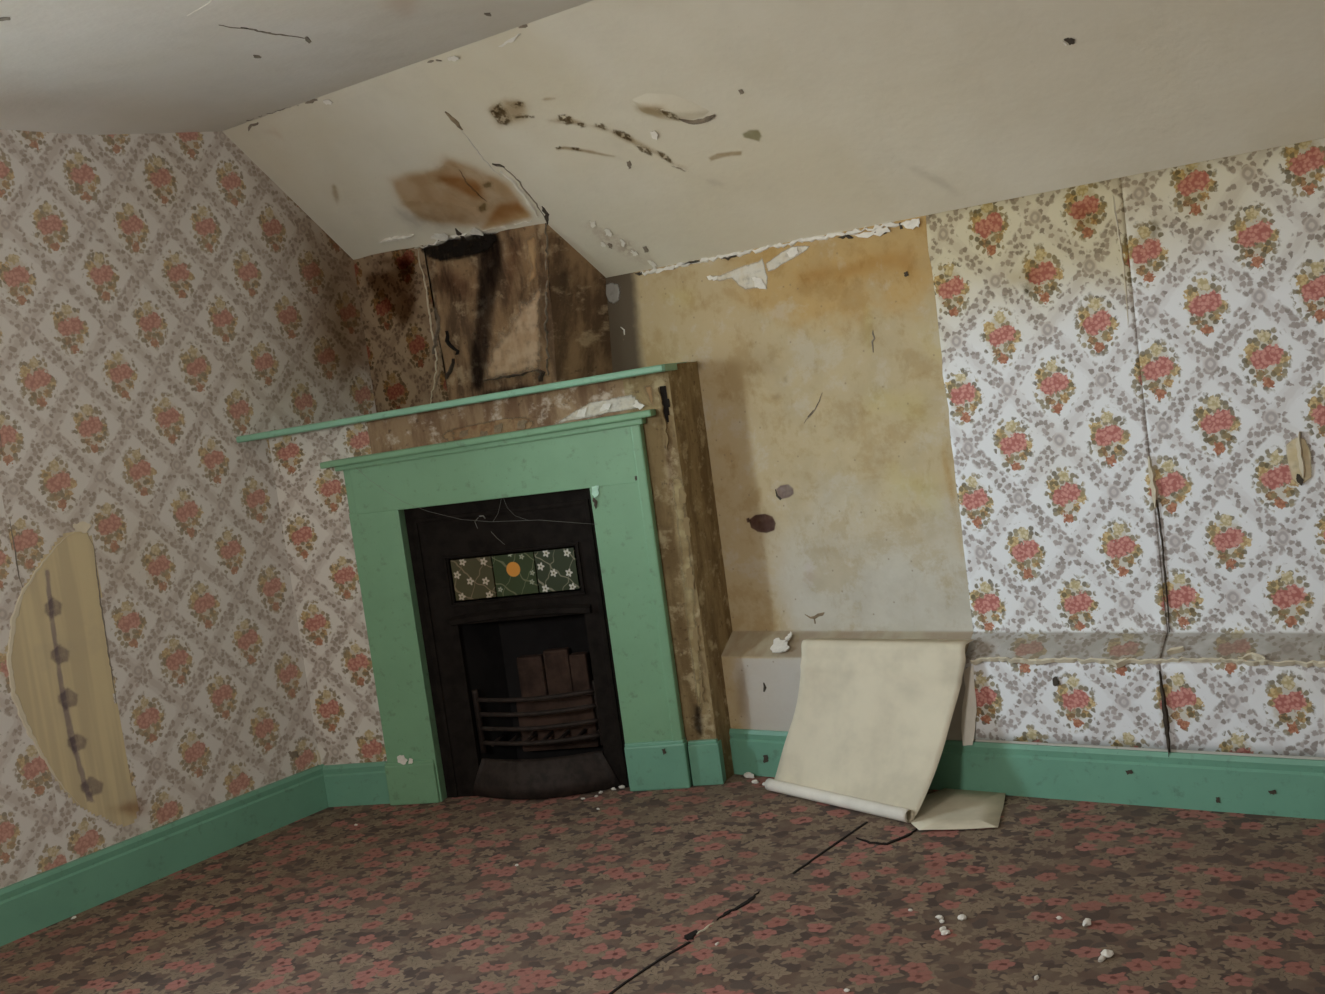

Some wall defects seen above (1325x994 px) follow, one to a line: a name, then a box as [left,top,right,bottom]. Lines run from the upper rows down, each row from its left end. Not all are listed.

crack [187,0,312,43]
peeling [589,219,920,289]
peeling [6,531,139,827]